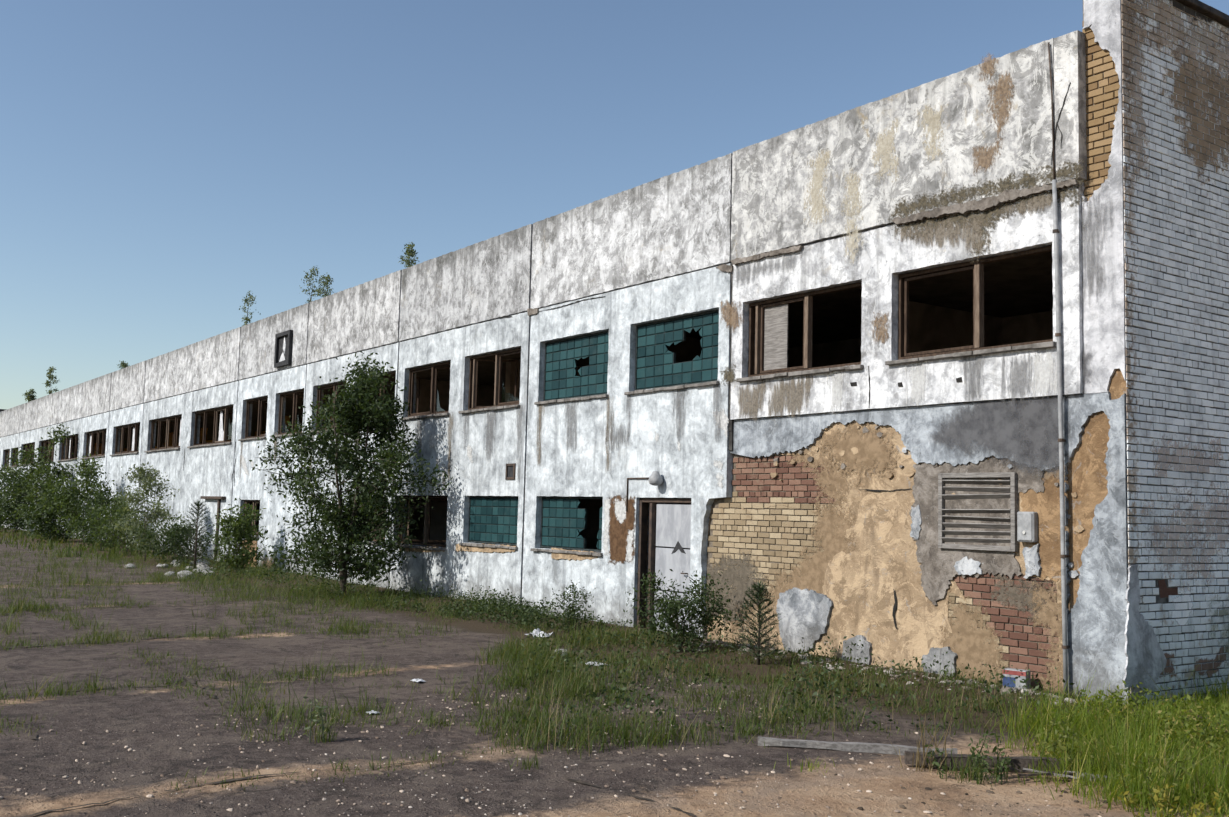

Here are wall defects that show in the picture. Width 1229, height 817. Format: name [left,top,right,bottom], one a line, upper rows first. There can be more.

water stain [803,151,863,261]
water stain [872,118,899,182]
water stain [917,105,944,160]
spalling [889,0,1229,262]
spalling [706,369,1130,694]
peeling [1150,439,1229,598]